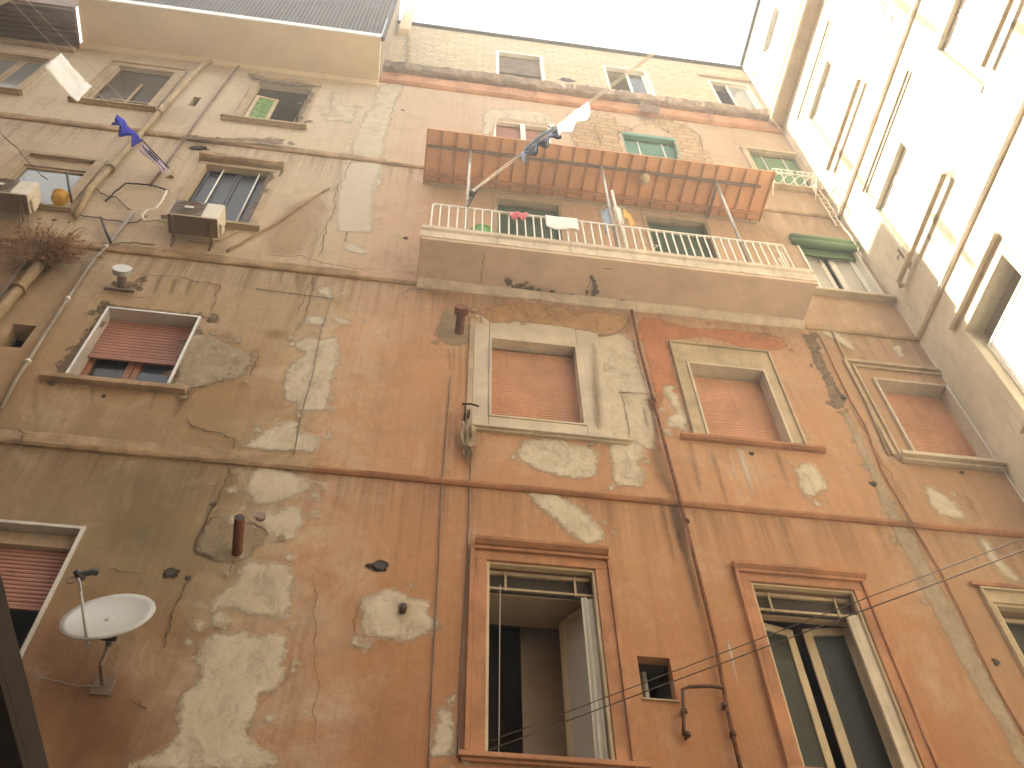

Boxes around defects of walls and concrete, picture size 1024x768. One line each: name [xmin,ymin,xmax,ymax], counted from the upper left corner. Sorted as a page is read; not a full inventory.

peeling [330,83,404,254]
spalling [570,111,632,152]
spalling [659,115,713,163]
crack [273,142,387,337]
peeling [246,316,349,453]
peeling [471,278,792,490]
crack [186,418,240,572]
peeling [229,468,327,541]
peeling [527,492,615,544]
crack [157,577,189,656]
peeling [129,553,297,768]
peeling [351,584,439,649]